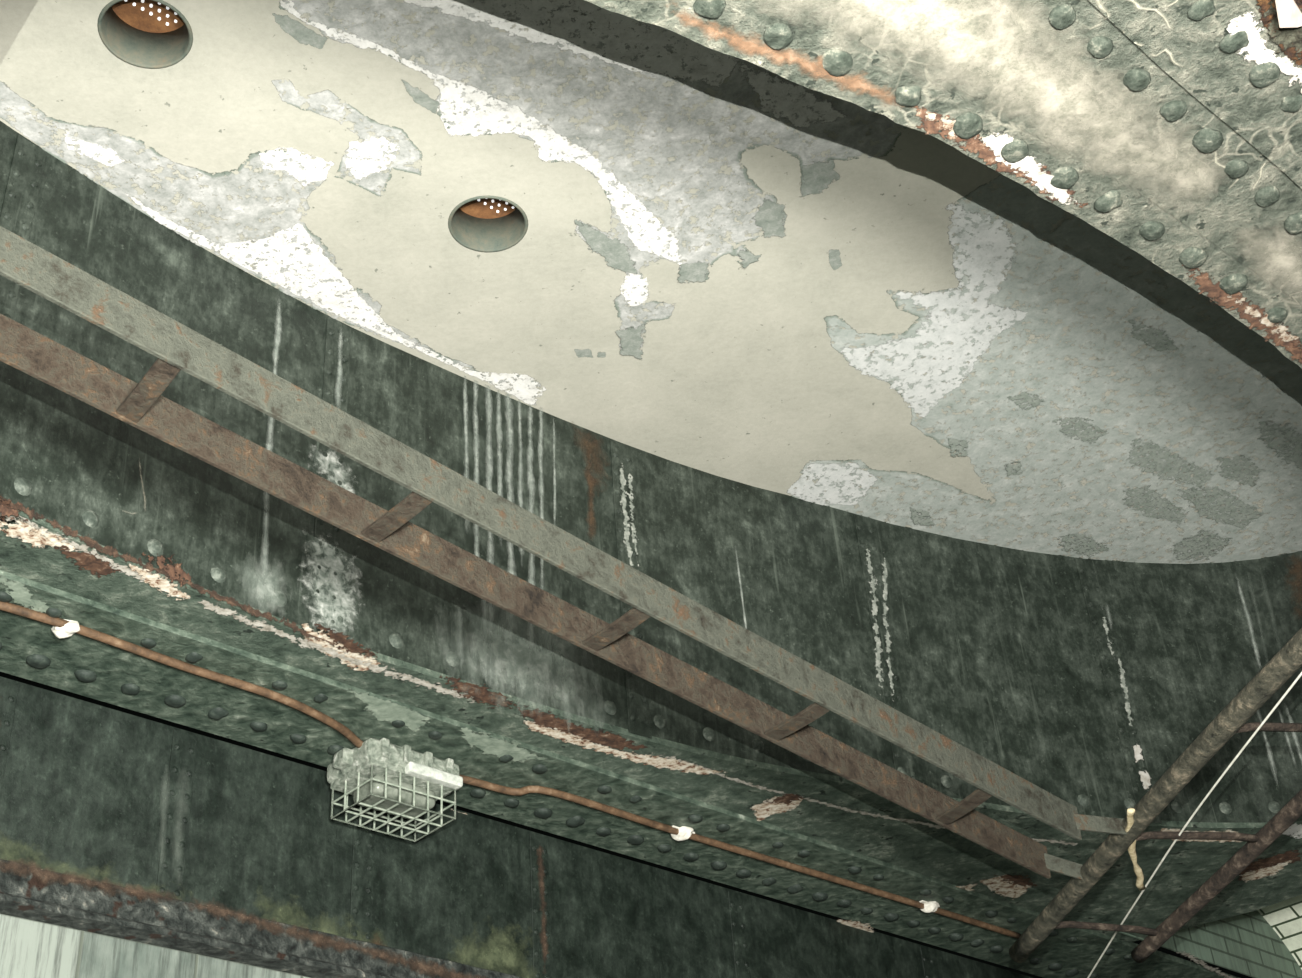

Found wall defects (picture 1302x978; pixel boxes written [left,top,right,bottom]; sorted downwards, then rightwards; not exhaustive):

peeling [0,79,546,405]
peeling [272,0,1302,564]
water stain [316,452,354,493]
water stain [464,382,556,520]
water stain [620,465,639,566]
peeling [0,495,475,703]
water stain [302,537,358,633]
water stain [866,544,894,696]
peeling [347,688,431,732]
peeling [459,728,547,763]
peeling [652,753,946,829]
water stain [1102,609,1152,790]